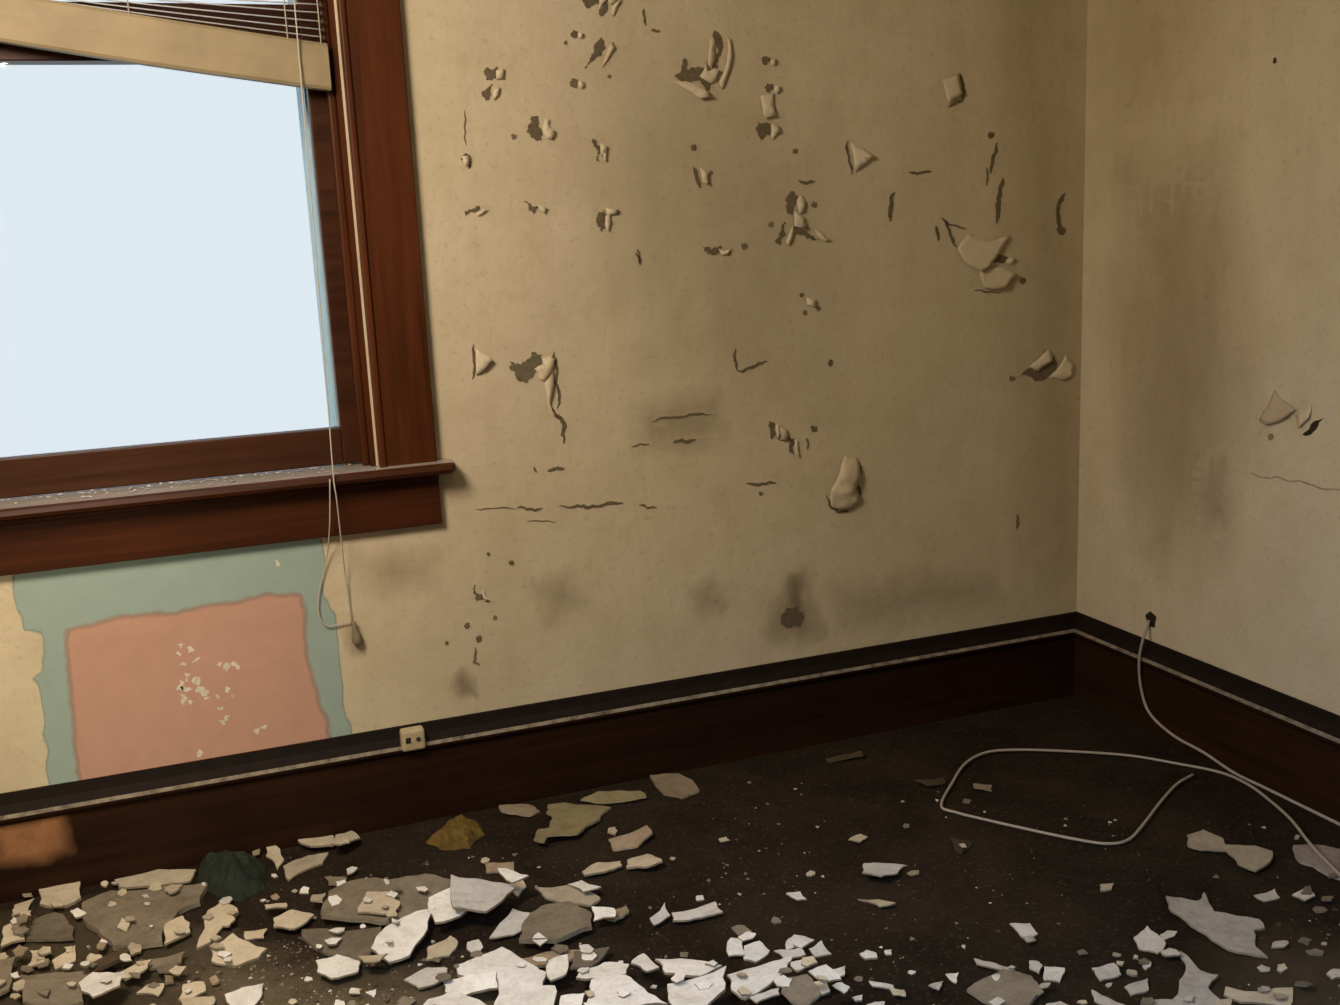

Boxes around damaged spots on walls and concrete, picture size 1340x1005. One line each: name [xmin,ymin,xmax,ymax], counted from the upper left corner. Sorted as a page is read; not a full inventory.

spalling [582,0,620,16]
peeling [461,110,472,169]
spalling [481,66,504,100]
spalling [511,116,555,141]
spalling [564,30,615,89]
peeling [670,30,732,99]
peeling [756,83,781,140]
peeling [768,180,830,245]
peeling [935,218,1026,293]
peeling [1009,349,1074,381]
peeling [509,352,567,444]
flaking render [13,538,352,785]